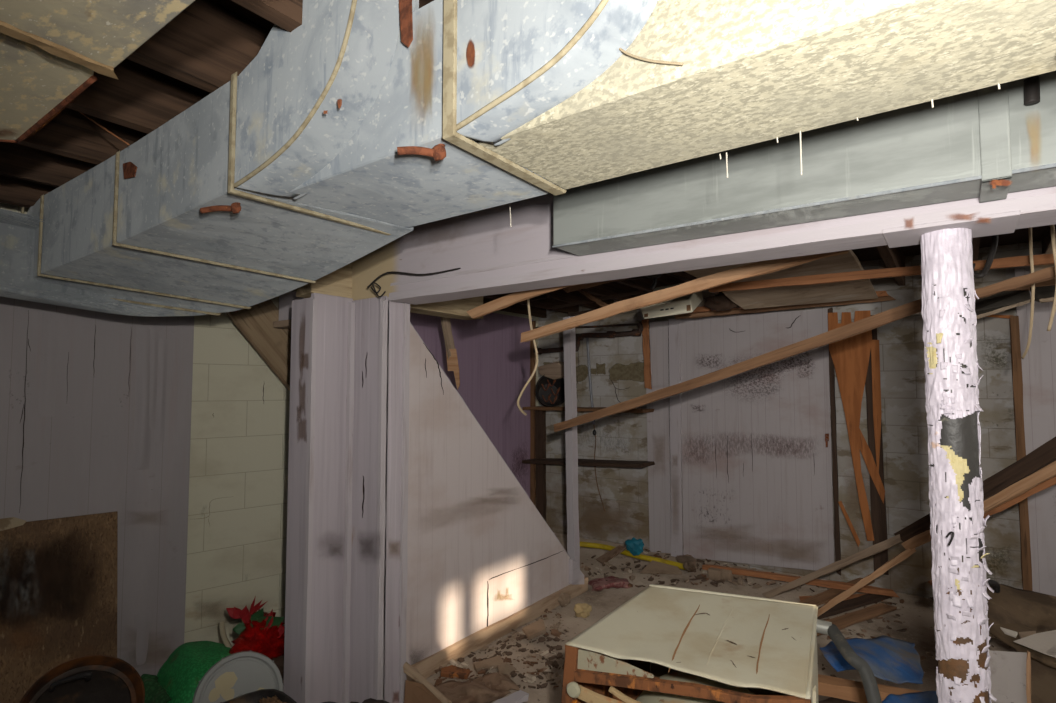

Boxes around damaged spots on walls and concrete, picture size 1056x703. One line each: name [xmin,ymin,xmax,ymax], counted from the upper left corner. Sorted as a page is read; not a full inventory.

peeling [946,515,1036,667]